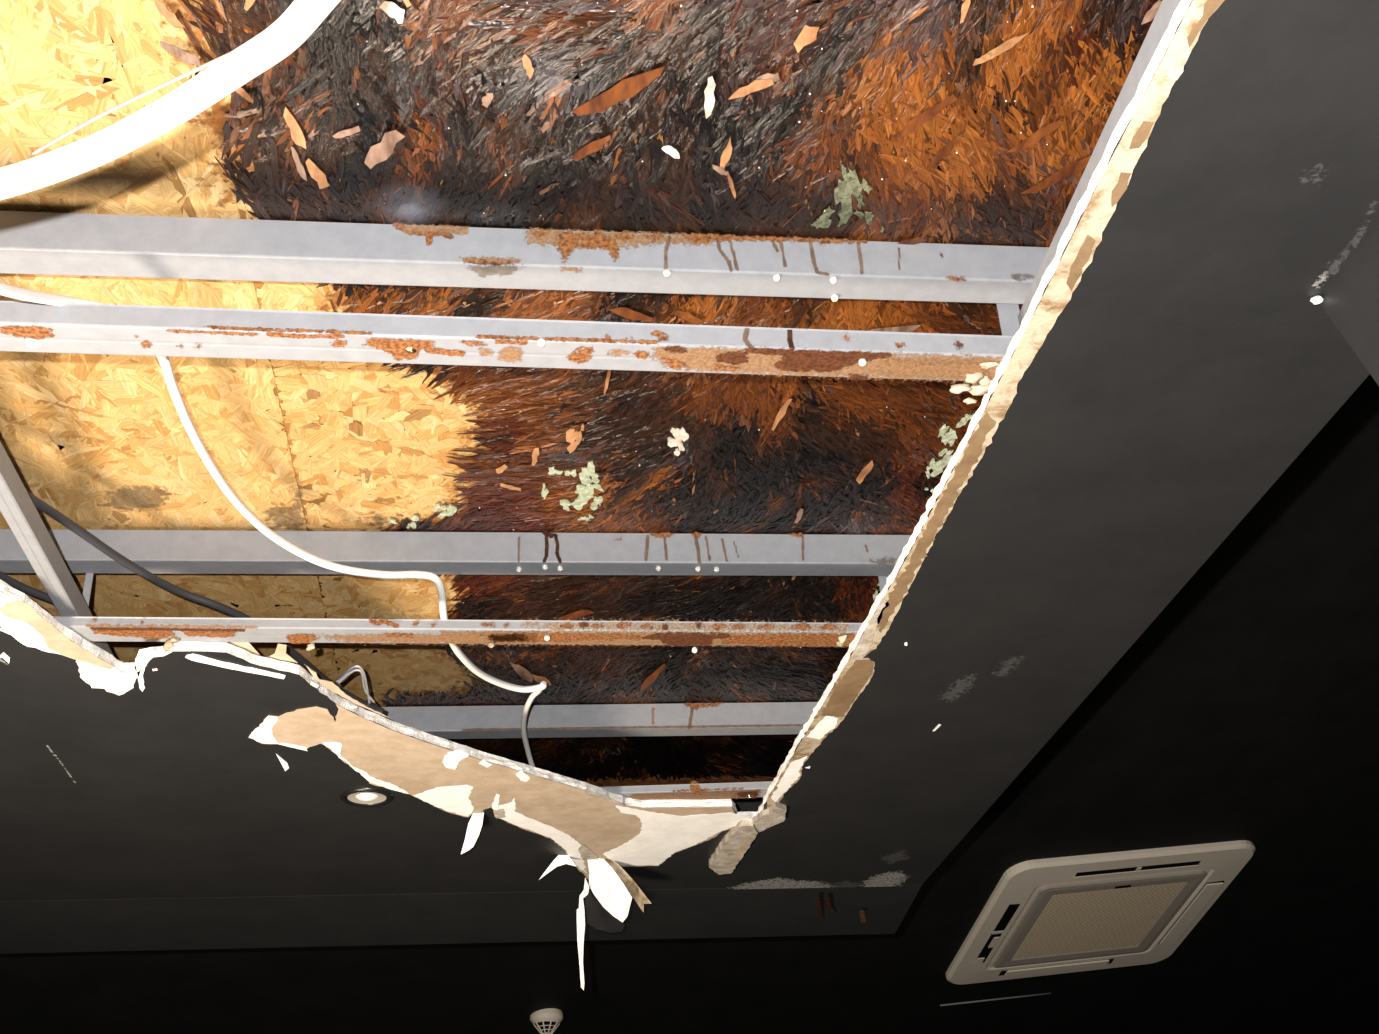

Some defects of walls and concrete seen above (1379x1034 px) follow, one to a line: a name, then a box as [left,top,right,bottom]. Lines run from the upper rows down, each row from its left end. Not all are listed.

damp [187,0,1162,247]
corrosion [393,222,469,246]
corrosion [459,227,867,276]
corrosion [0,325,55,340]
corrosion [166,325,1003,384]
damp [314,283,1002,336]
damp [365,363,985,535]
damp [431,575,888,623]
corrosion [86,618,257,640]
corrosion [286,618,856,647]
damp [380,643,849,707]
damp [447,734,799,787]